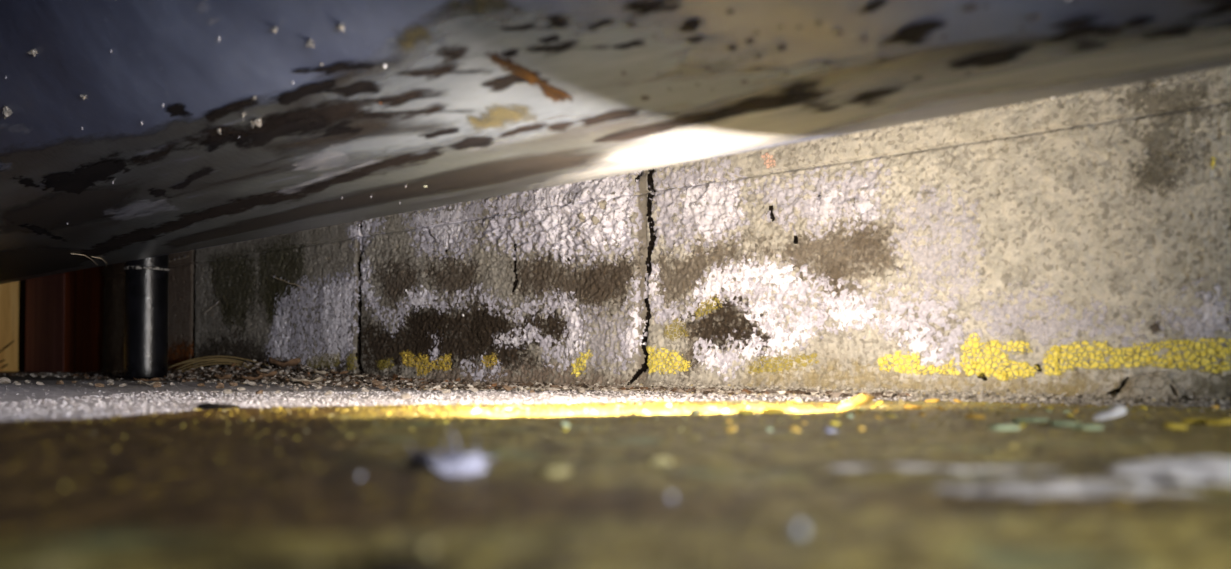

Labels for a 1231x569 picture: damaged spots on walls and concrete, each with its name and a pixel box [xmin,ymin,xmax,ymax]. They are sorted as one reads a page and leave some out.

corrosion [488,52,573,102]
crack [627,169,657,385]
leakage [197,157,1231,386]